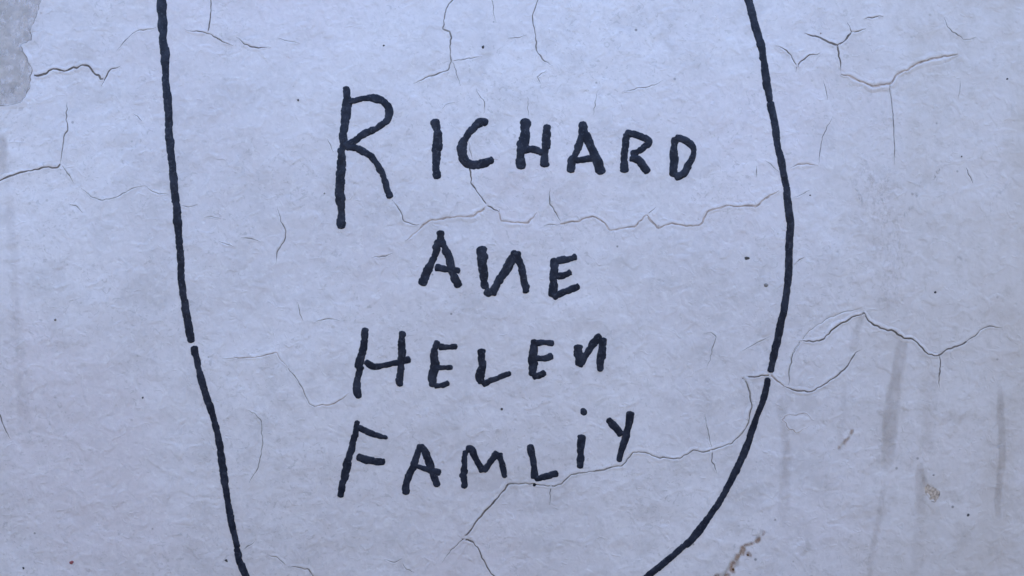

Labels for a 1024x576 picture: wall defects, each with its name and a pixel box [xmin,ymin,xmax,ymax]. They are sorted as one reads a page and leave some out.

peeling [0,0,47,110]
crack [34,26,156,87]
crack [0,102,289,264]
crack [372,0,976,260]
crack [441,305,1002,576]